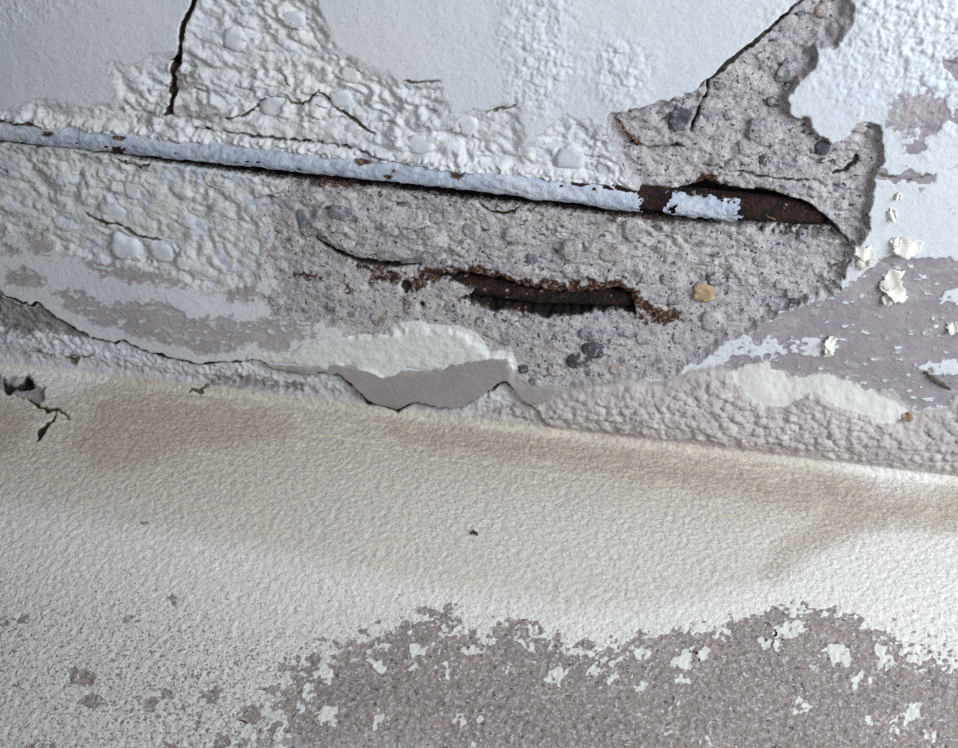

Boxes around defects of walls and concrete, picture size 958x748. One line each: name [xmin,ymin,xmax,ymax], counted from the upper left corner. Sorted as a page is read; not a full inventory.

crack [164,0,405,165]
crack [110,156,150,168]
crack [86,212,160,240]
spalling [0,0,958,422]
rust [293,271,323,282]
rust [352,258,402,290]
crack [3,294,254,395]
crack [344,379,410,412]
crack [23,398,69,442]
water stain [0,376,958,534]
peeling [0,614,28,627]
peeling [58,597,958,748]